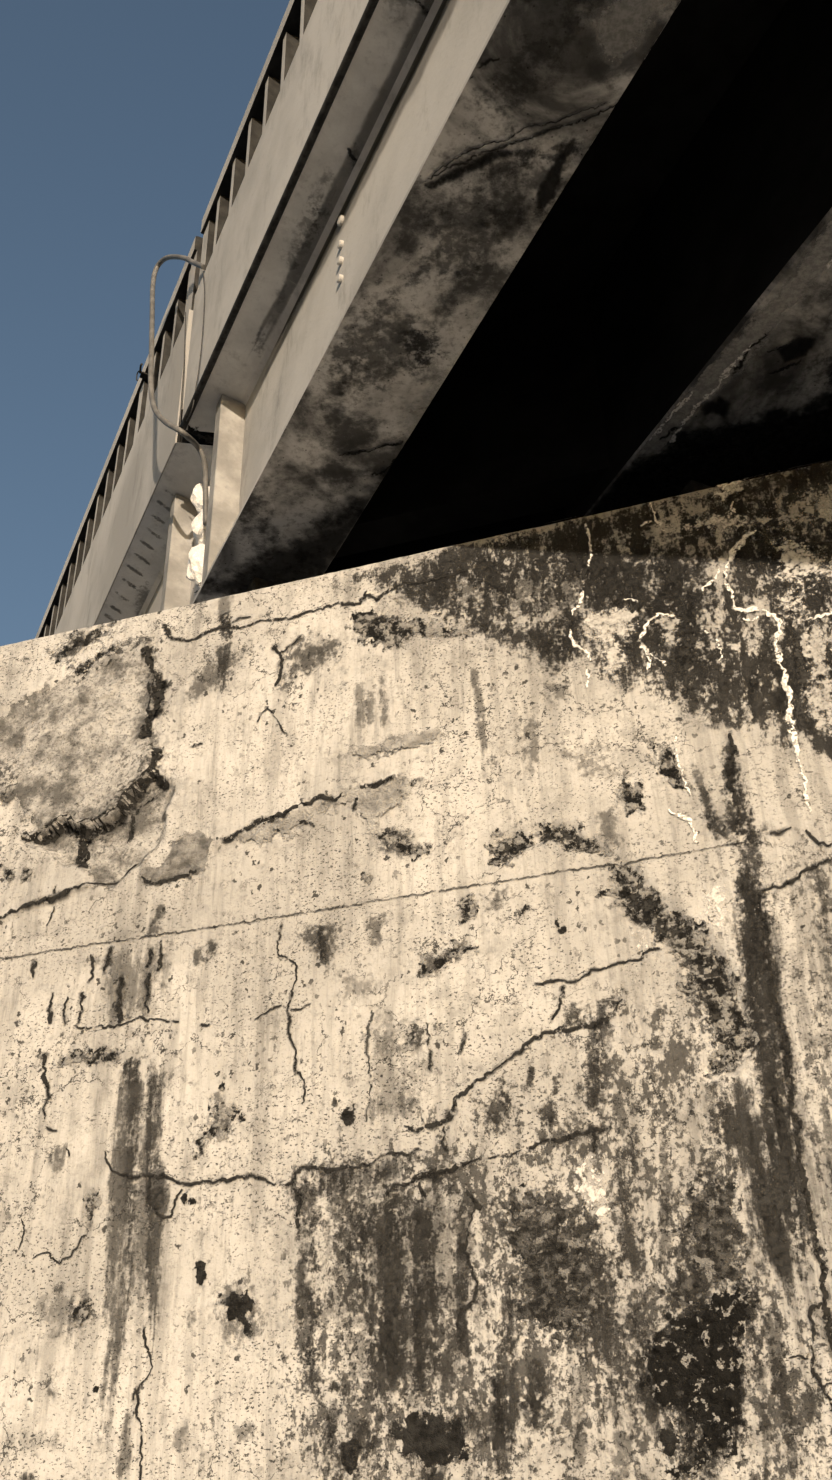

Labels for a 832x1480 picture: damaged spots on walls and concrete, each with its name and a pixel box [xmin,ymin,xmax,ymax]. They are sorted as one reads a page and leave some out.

damp [283,0,447,331]
damp [203,470,388,691]
spalling [0,620,239,892]
spalling [374,827,432,862]
damp [273,221,832,1480]
crack [726,733,738,802]
crack [40,1053,57,1132]
damp [102,1060,172,1399]
crack [75,1016,210,1029]
crack [104,924,660,1334]
crack [753,827,832,1412]
damp [118,1414,131,1477]